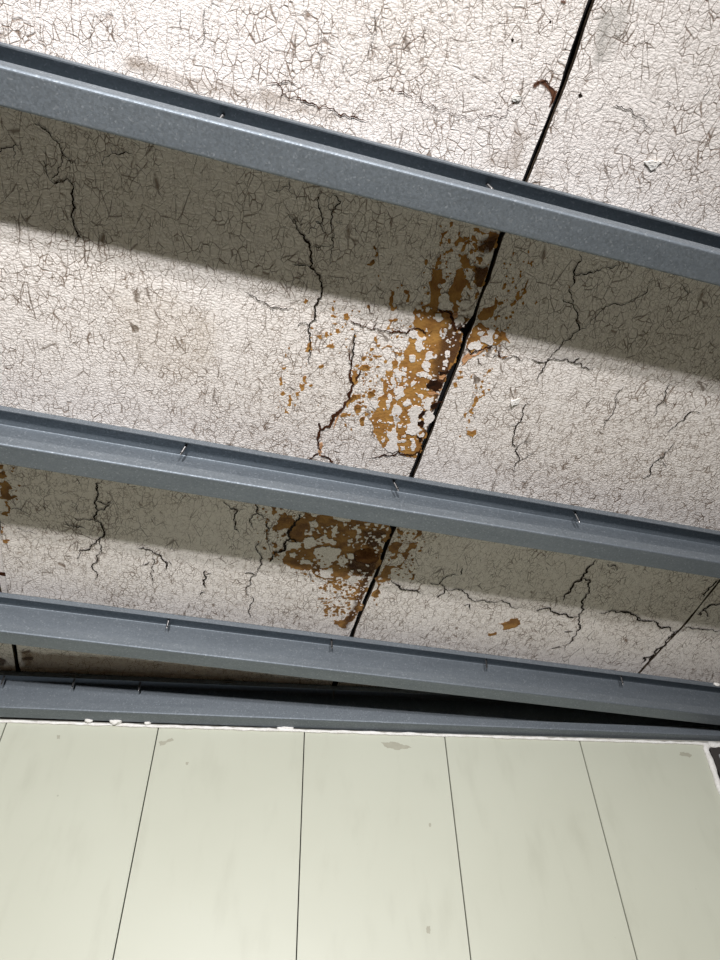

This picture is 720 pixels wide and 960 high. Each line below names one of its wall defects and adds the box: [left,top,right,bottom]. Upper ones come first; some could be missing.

crack [398,91,516,120]
corrosion [533,79,558,107]
crack [35,124,82,245]
crack [250,184,342,362]
corrosion [476,268,487,286]
corrosion [480,237,496,251]
corrosion [432,319,467,412]
crack [310,254,653,469]
crack [65,478,110,578]
corrosion [365,531,383,546]
corrosion [347,554,373,623]
crack [391,561,720,665]